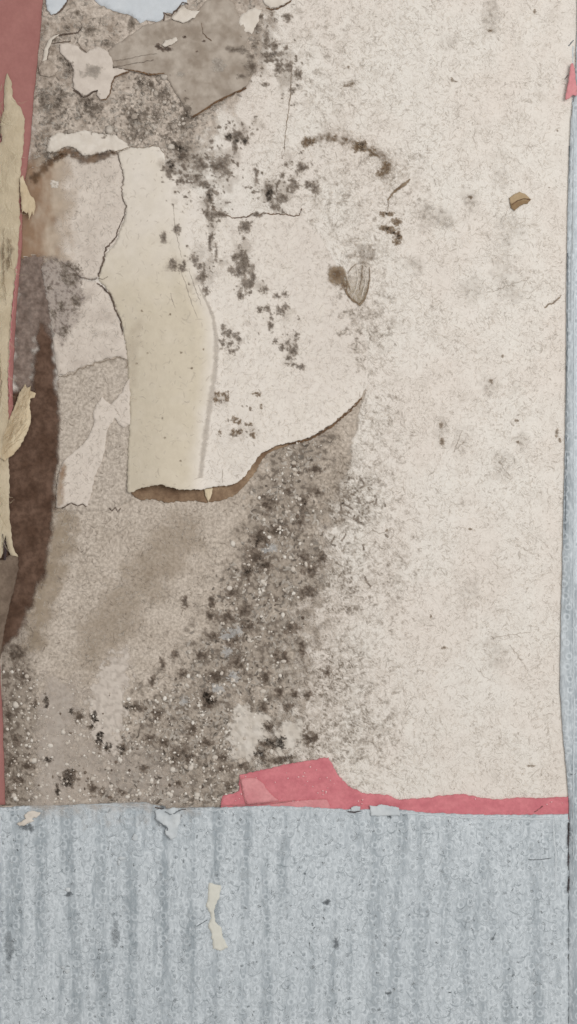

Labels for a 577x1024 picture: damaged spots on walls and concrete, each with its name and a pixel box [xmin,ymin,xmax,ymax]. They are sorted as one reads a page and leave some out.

crack [61,151,127,334]
leakage [34,60,391,370]
leakage [379,179,411,245]
flaking render [0,0,366,840]
leakage [0,258,386,808]
peeling [206,883,228,951]